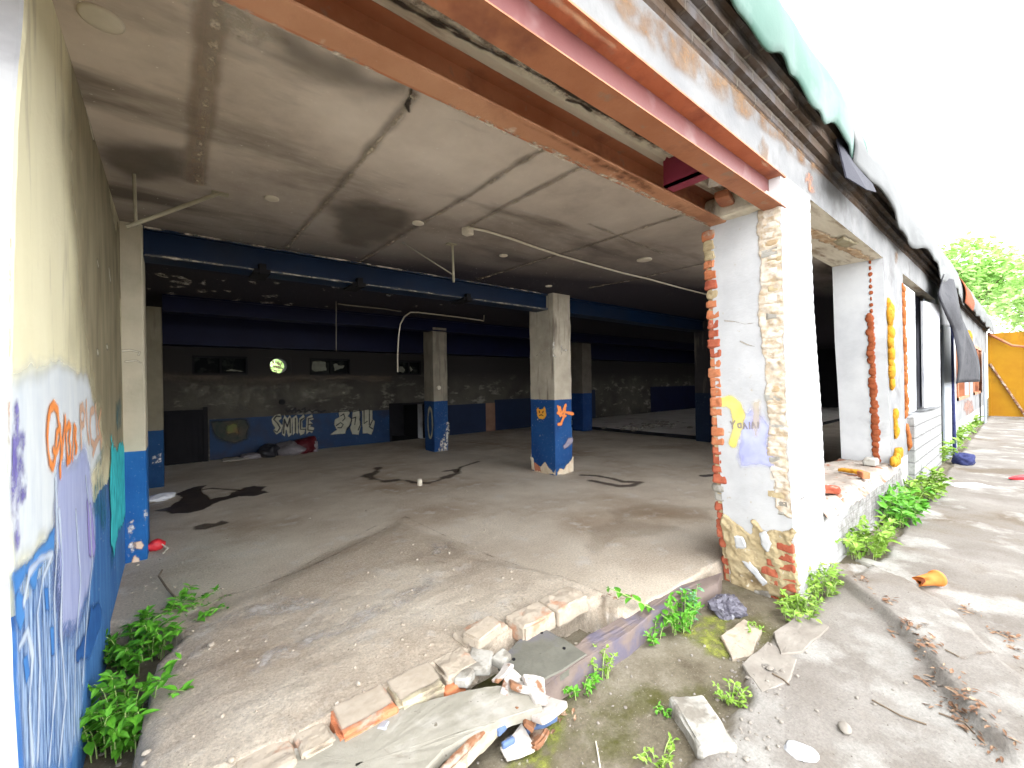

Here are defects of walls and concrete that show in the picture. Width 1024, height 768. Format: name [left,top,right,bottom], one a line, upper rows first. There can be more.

corrosion [617,0,822,173]
flaking render [530,142,801,601]
flaking render [811,228,881,463]